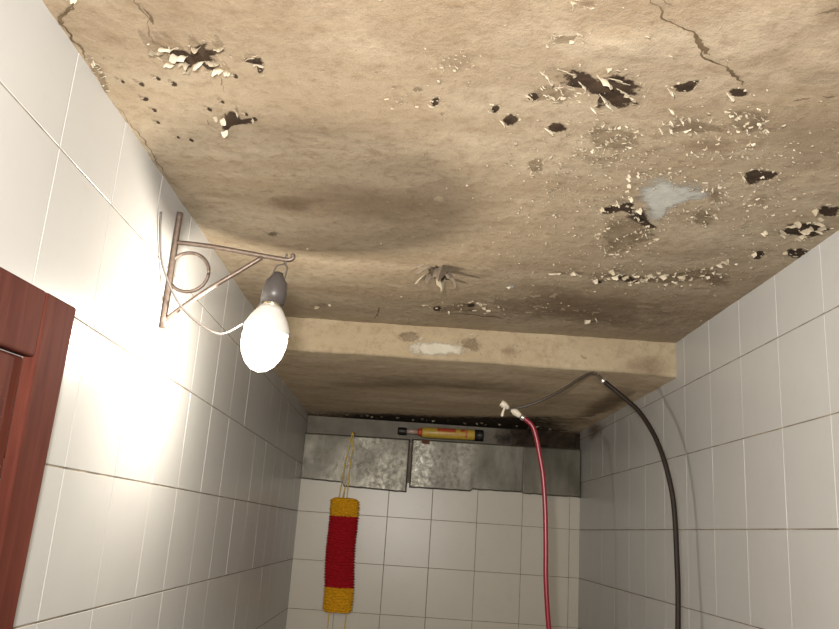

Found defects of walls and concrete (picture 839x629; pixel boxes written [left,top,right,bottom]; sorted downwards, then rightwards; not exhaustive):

peeling [85,58,125,93]
peeling [147,40,238,91]
peeling [244,55,265,77]
peeling [525,64,649,115]
crack [649,0,744,86]
peeling [203,101,258,138]
peeling [543,121,567,136]
peeling [573,124,643,168]
peeling [596,172,729,257]
peeling [760,189,839,258]
peeling [410,264,500,315]
peeling [592,259,738,286]